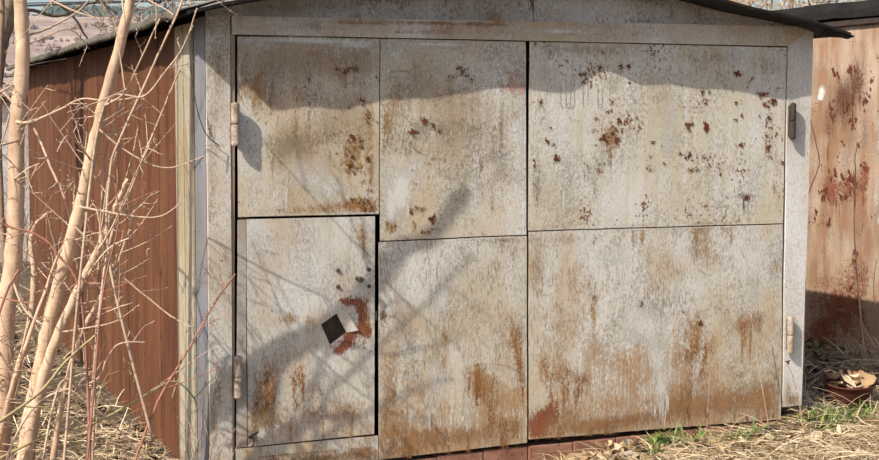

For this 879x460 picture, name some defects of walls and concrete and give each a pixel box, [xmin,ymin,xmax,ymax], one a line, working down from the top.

rust [826,67,865,135]
rust [822,155,871,216]
rust [330,296,372,355]
rust [805,262,875,351]
rust [383,313,797,458]